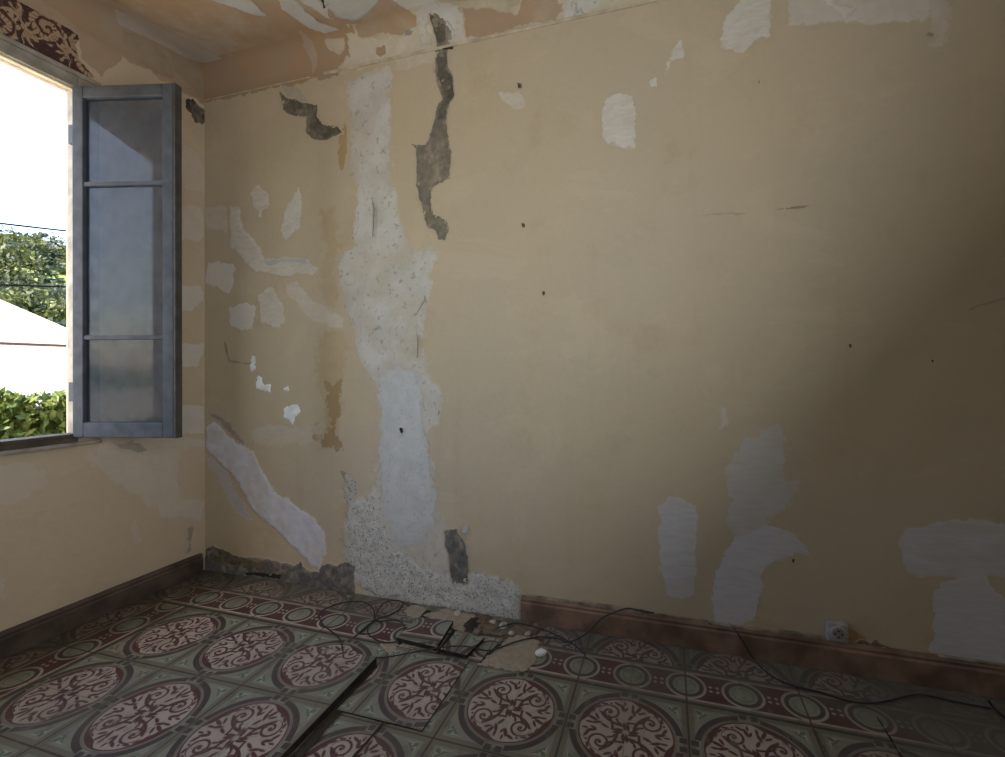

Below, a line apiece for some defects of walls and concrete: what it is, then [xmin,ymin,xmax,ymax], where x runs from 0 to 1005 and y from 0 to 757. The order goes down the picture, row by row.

crack [321,0,361,24]
peeling [439,0,564,40]
peeling [17,0,419,126]
crack [277,85,344,142]
crack [411,13,455,242]
crack [369,199,377,236]
spalling [463,617,479,629]